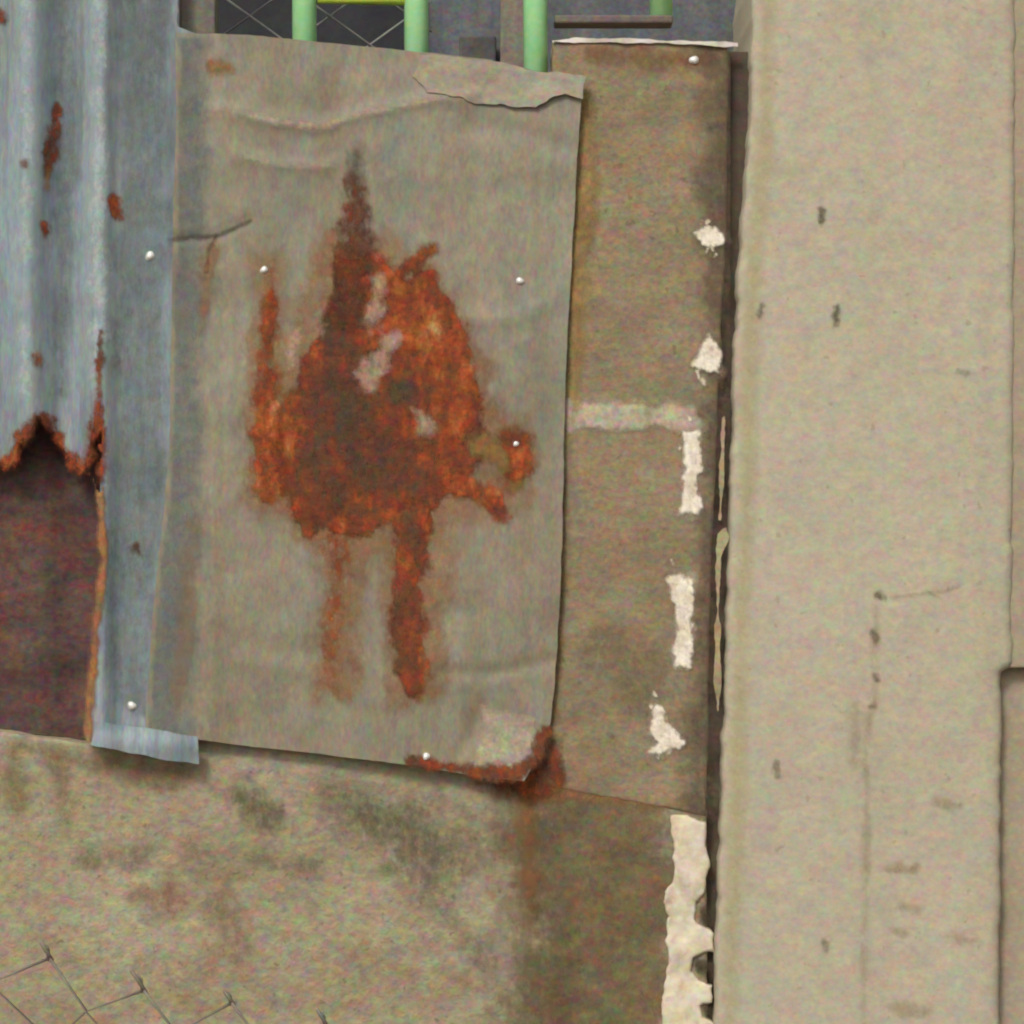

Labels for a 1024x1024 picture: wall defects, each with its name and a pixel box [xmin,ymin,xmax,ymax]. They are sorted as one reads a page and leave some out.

corrosion [42,102,62,189]
corrosion [565,91,598,411]
peeling [695,220,725,255]
peeling [692,329,723,385]
corrosion [246,154,534,702]
peeling [677,416,707,520]
corrosion [0,330,108,742]
peeling [666,573,698,669]
corrosion [405,702,620,839]
peeling [646,692,685,758]
spalling [700,906,712,925]
spalling [694,959,712,972]